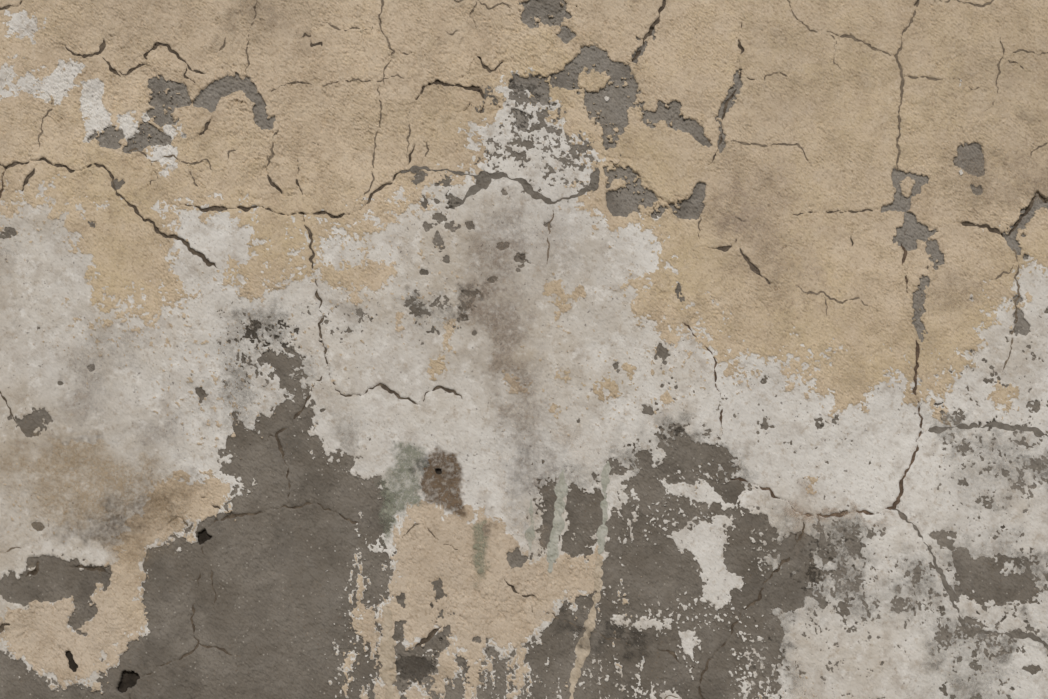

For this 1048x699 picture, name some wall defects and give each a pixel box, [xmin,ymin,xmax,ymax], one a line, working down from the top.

spalling [0,39,275,177]
spalling [519,0,577,44]
crack [627,0,666,63]
spalling [640,100,712,147]
crack [708,22,808,165]
crack [787,0,1048,172]
crack [0,0,600,525]
spalling [881,168,945,350]
crack [961,191,1048,370]
crack [660,340,1048,699]
peeling [392,620,470,699]
peeling [471,589,597,699]